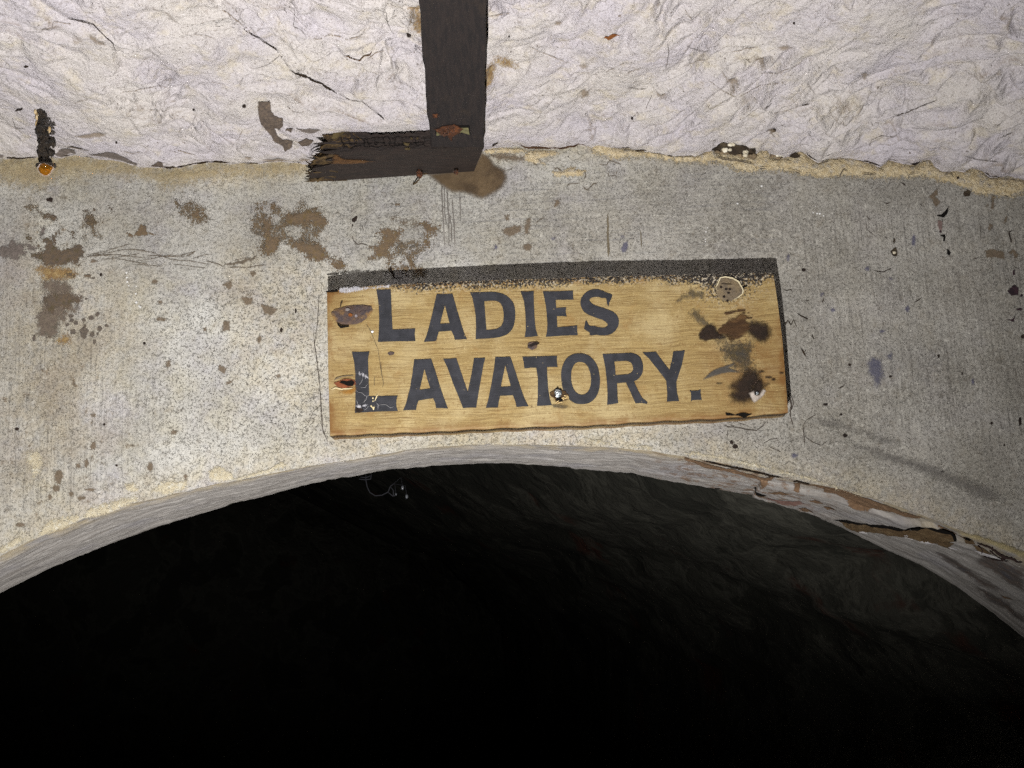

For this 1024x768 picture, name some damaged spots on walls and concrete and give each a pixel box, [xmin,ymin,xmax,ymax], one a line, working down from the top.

rust [34,108,57,177]
damp [32,279,109,344]
flaking render [685,458,1001,560]